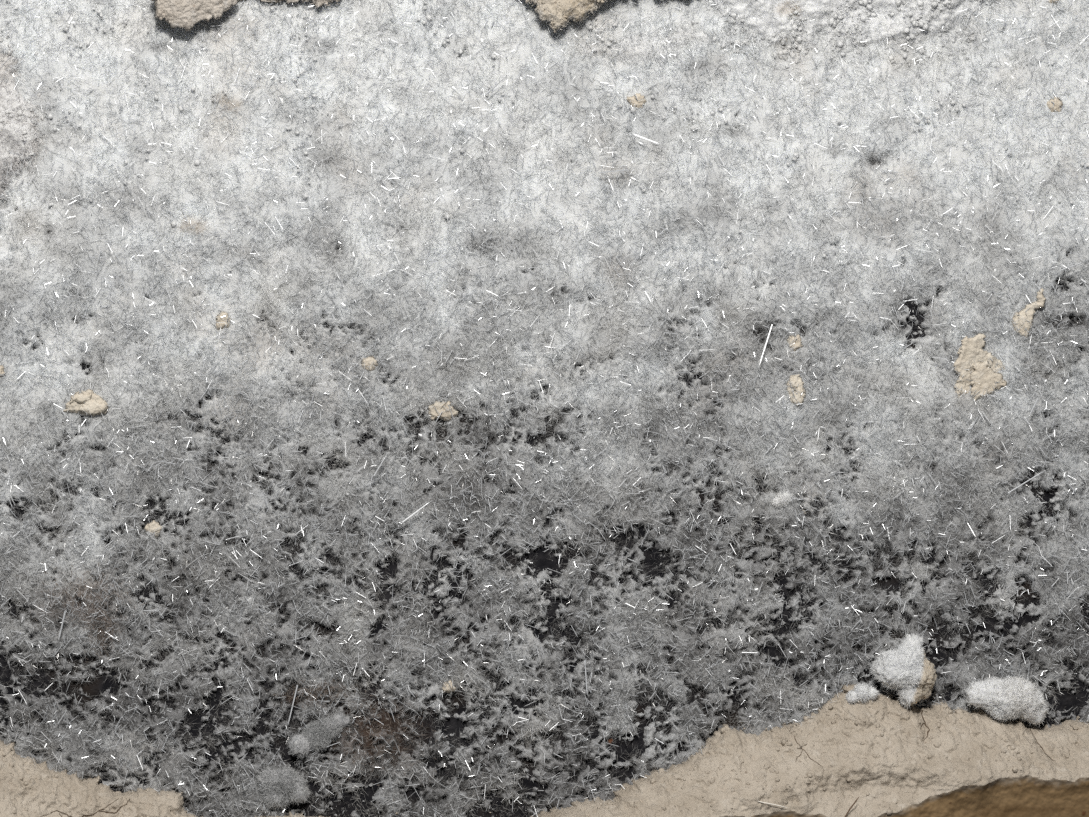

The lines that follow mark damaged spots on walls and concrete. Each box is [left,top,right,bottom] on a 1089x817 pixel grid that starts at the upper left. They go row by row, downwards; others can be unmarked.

peeling [525,0,606,33]
spalling [215,311,231,330]
spalling [1012,288,1046,338]
spalling [953,333,1007,401]
spalling [63,389,108,416]
spalling [428,401,459,421]
spalling [786,374,806,406]
spalling [144,520,163,537]
spalling [442,680,456,693]
leakage [1072,701,1089,724]
spalling [530,684,1089,817]
spalling [0,740,203,817]